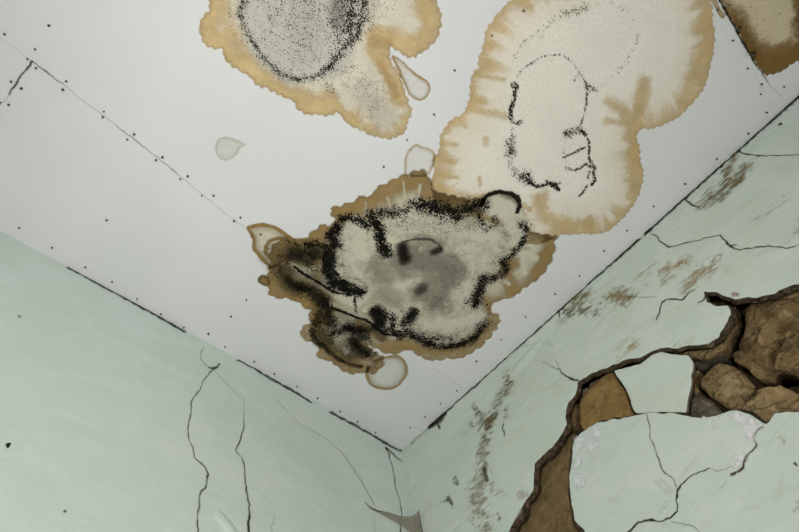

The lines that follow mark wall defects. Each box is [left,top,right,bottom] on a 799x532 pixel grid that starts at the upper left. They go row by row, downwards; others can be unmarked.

water stain [199,0,442,139]
water stain [247,0,799,390]
rust [698,154,752,209]
crack [738,148,799,156]
crack [652,234,797,250]
rust [563,292,597,316]
rust [606,290,632,305]
crack [187,350,220,532]
crack [235,419,251,532]
crack [385,447,402,532]
flaking render [509,284,799,532]